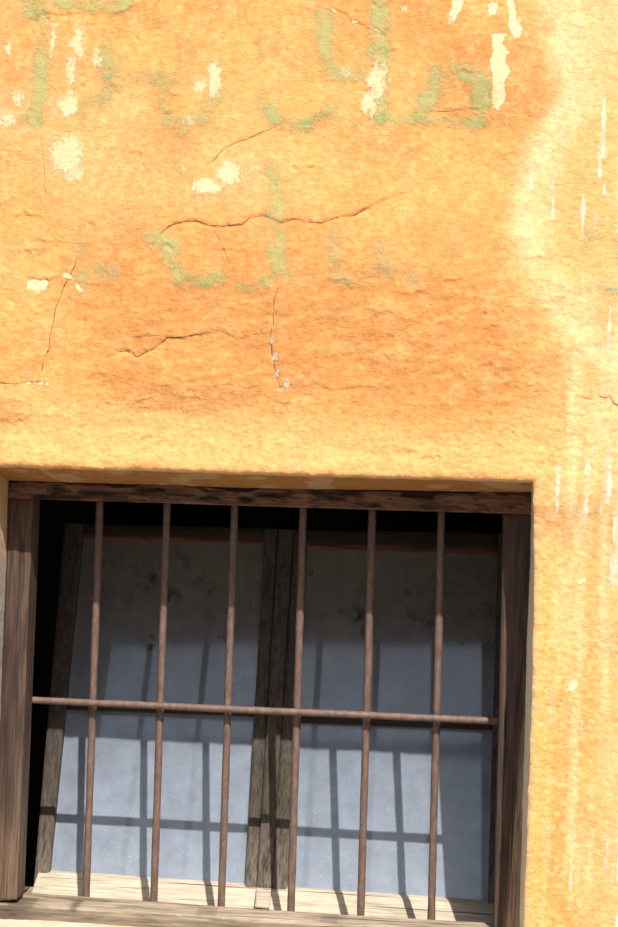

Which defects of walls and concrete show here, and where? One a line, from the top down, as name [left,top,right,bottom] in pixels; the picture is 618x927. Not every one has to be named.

peeling [447,0,464,24]
peeling [487,0,523,110]
crack [162,208,366,264]
crack [0,255,78,385]
crack [96,334,201,362]
crack [259,287,292,390]